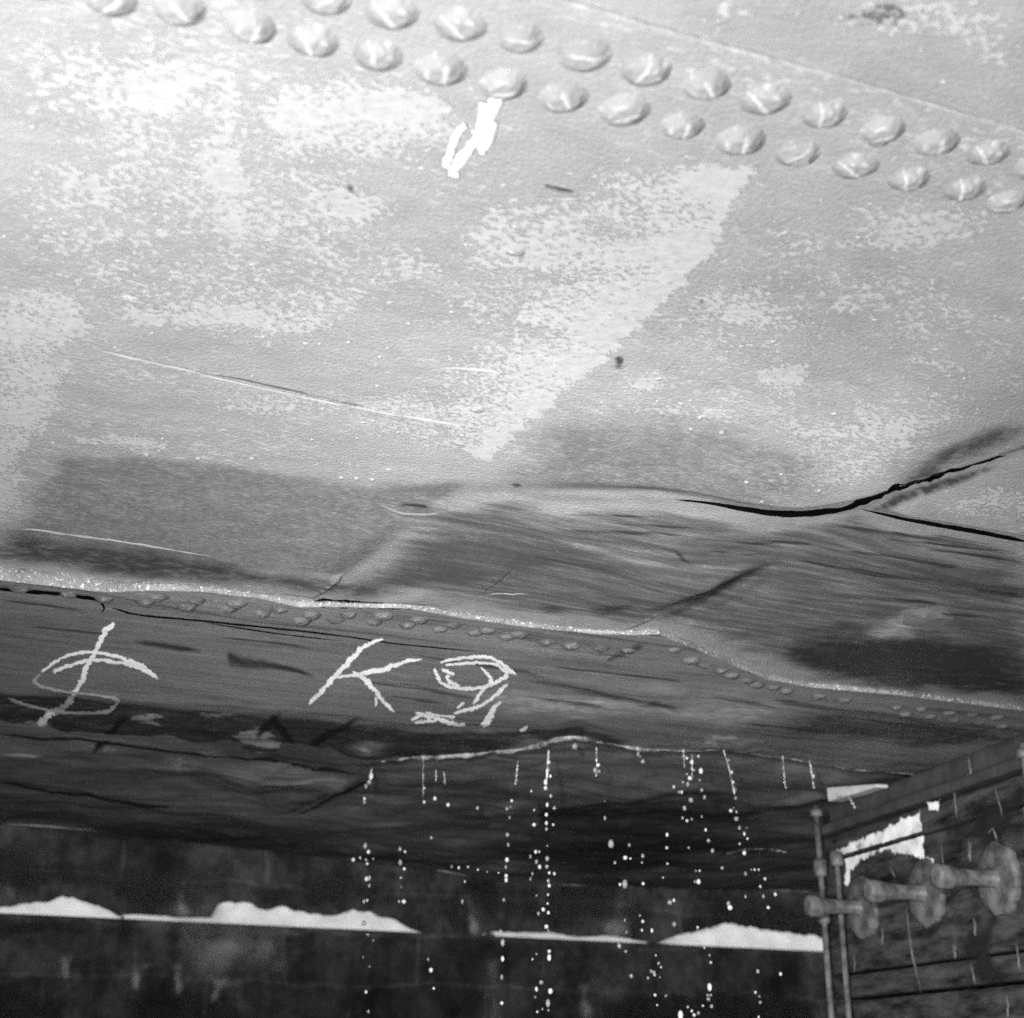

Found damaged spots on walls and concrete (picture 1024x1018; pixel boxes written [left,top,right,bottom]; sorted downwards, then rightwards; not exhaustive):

crack [674,456,1024,542]
leakage [105,827,353,856]
leakage [524,798,747,869]
leakage [448,891,646,936]
leakage [718,909,821,935]
leakage [603,992,812,1018]